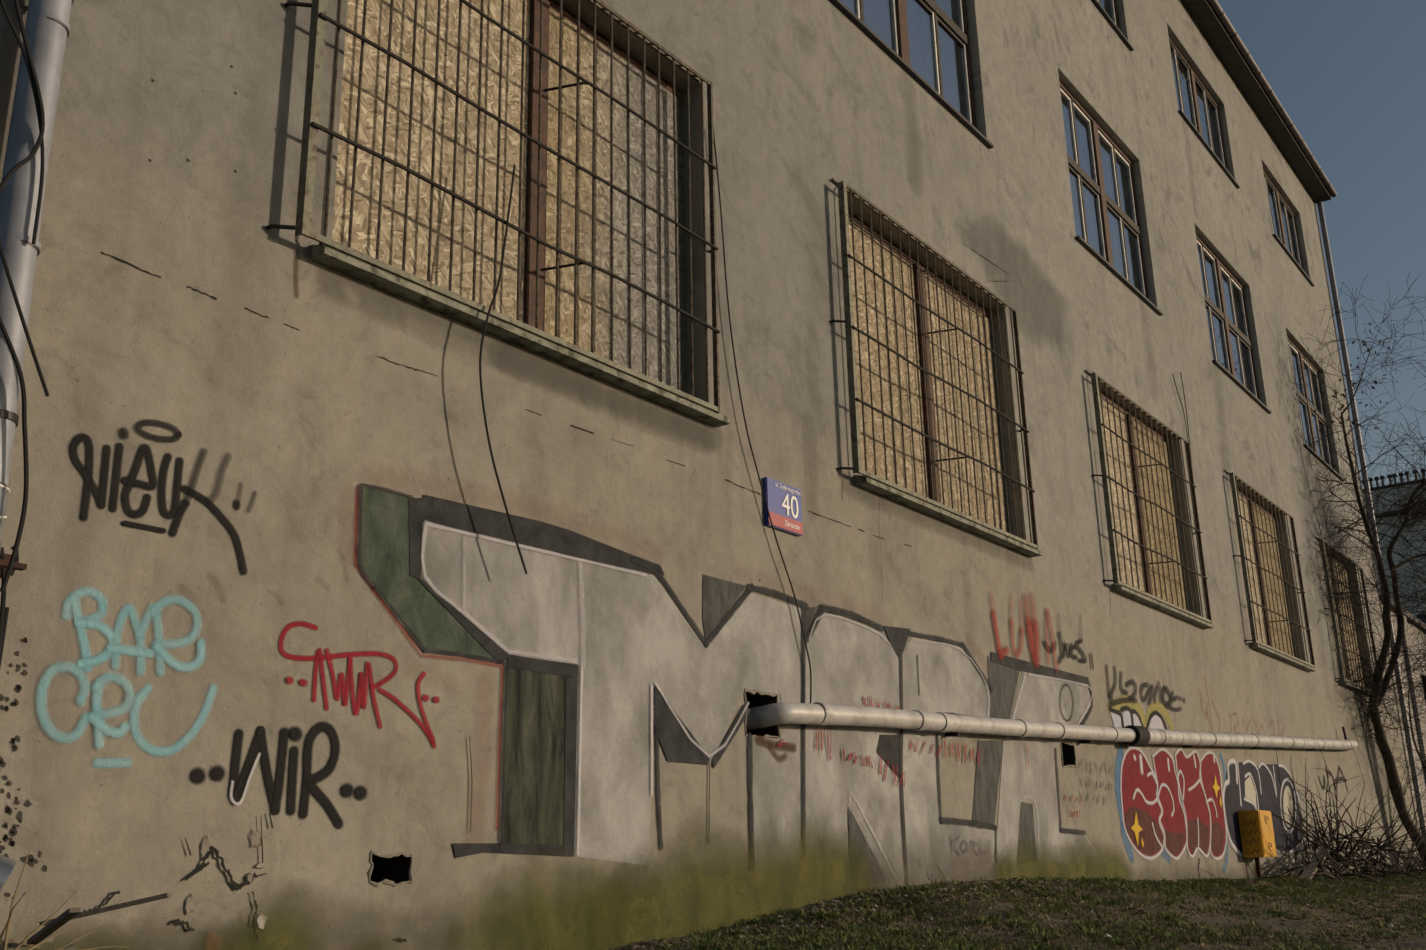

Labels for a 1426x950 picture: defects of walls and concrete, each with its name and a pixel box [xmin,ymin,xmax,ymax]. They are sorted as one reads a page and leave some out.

damp [969,229,1061,344]
crack [185,813,273,940]
spalling [368,850,413,887]
crack [88,891,120,911]
crack [171,919,195,931]